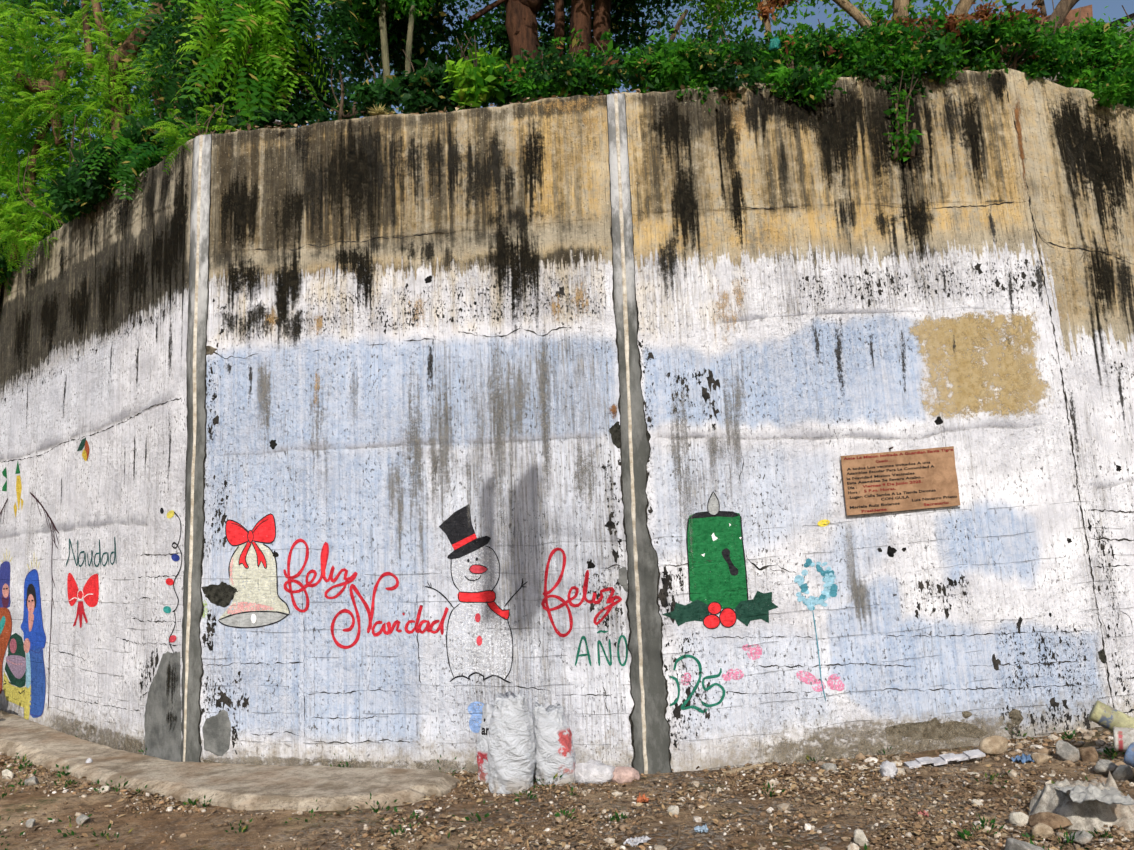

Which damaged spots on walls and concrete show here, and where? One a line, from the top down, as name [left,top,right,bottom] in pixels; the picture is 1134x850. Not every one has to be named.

water stain [988,70,1007,111]
crack [4,398,181,462]
water stain [14,160,189,428]
water stain [221,118,544,344]
water stain [648,83,987,299]
water stain [834,317,845,395]
water stain [900,272,1050,418]
water stain [1035,261,1043,303]
water stain [1069,392,1079,461]
water stain [1050,95,1134,439]